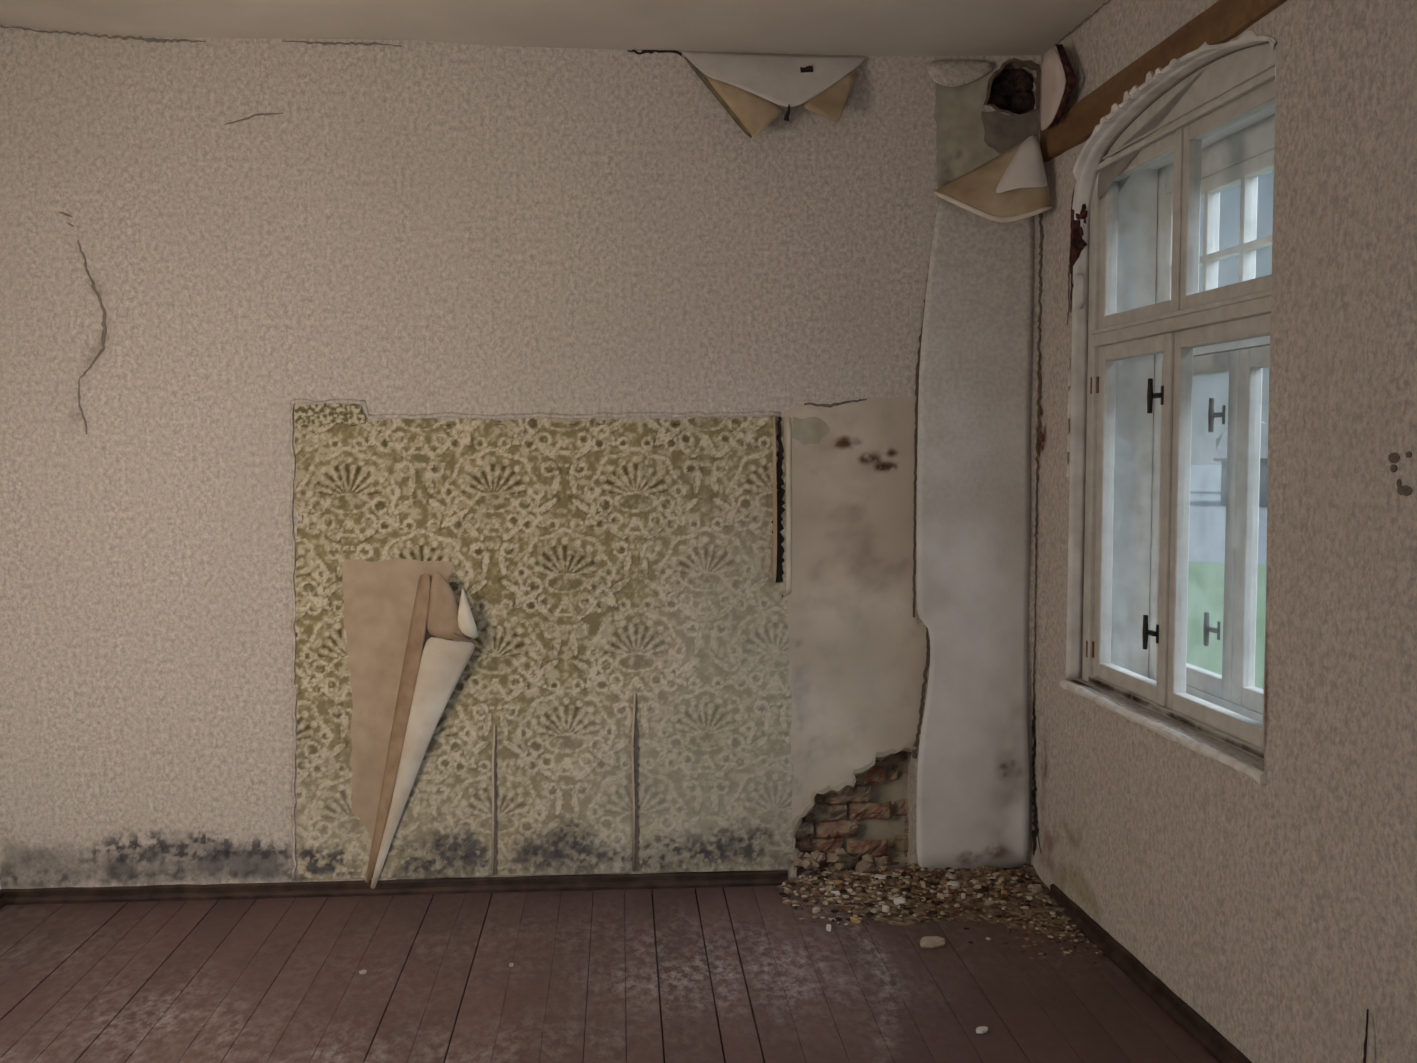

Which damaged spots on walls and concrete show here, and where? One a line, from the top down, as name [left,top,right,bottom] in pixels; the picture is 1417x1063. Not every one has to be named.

peeling [683,52,866,138]
peeling [927,58,1052,223]
crack [60,212,107,435]
peeling [777,396,929,878]
water stain [94,834,344,878]
water stain [405,838,486,872]
water stain [520,825,767,867]